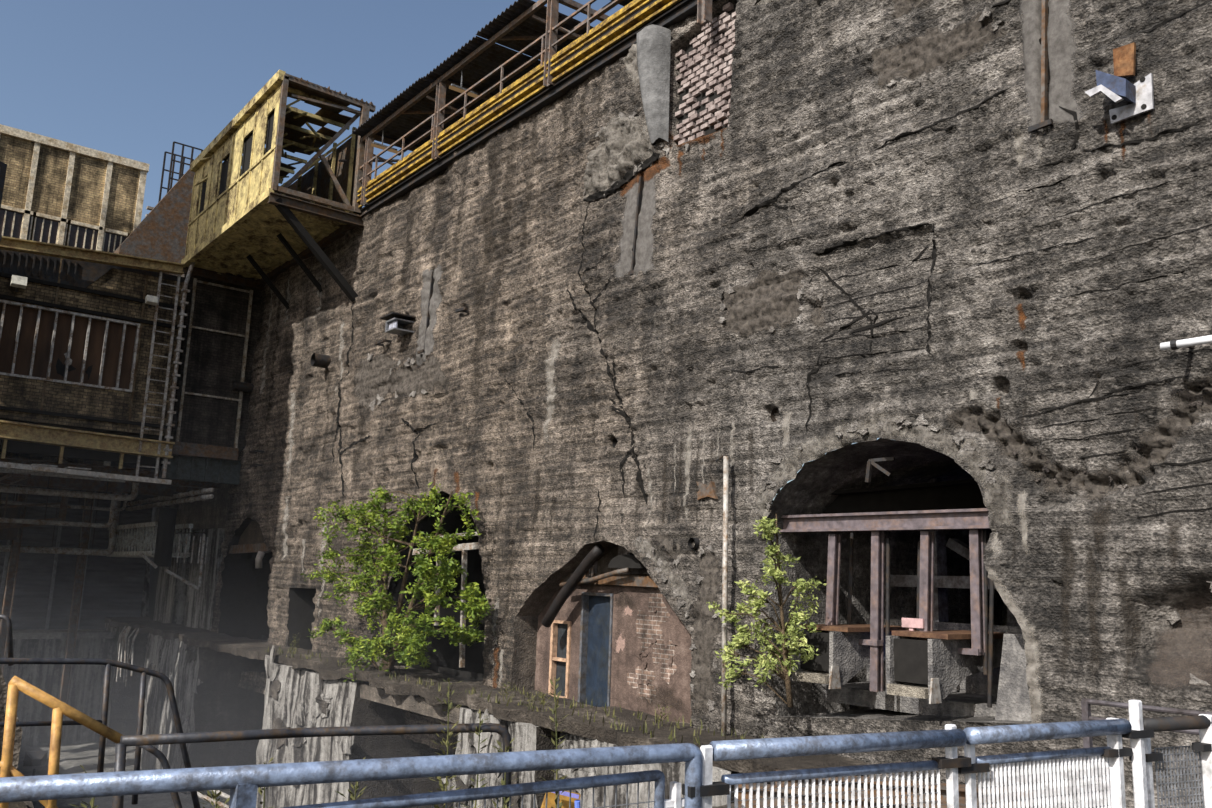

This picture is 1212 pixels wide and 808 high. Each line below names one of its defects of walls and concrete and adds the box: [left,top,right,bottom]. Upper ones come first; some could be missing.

spalling [583,0,770,202]
rust [1104,120,1125,157]
crack [332,302,371,497]
crack [567,205,647,540]